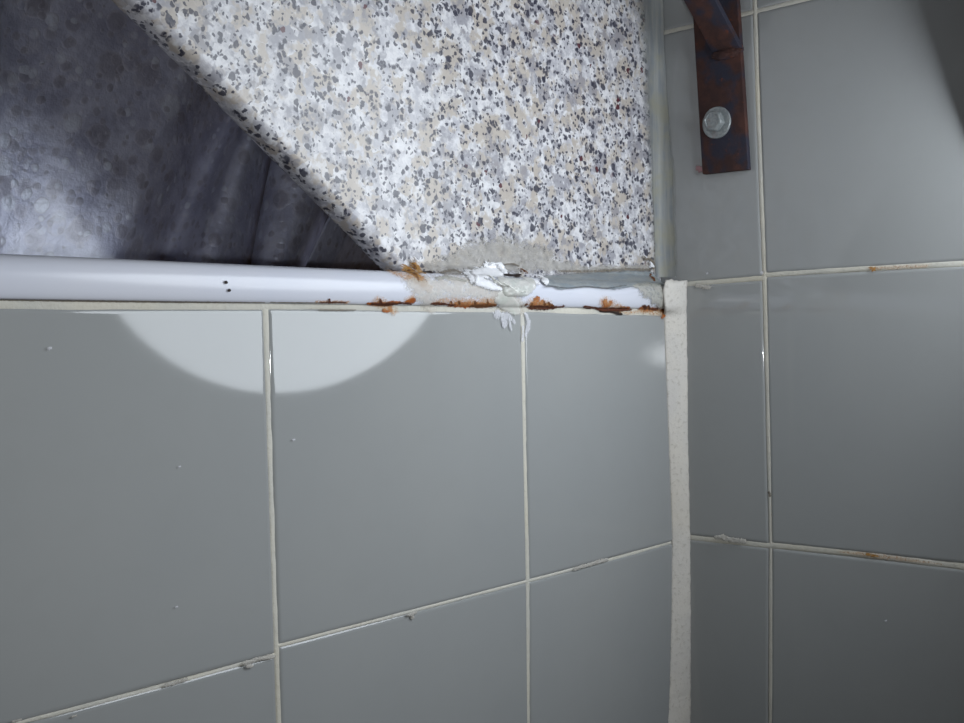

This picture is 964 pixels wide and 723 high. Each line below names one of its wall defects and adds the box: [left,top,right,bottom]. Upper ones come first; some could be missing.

corrosion [400,262,427,282]
corrosion [367,296,416,313]
corrosion [430,299,497,309]
corrosion [522,296,565,311]
corrosion [583,299,665,319]